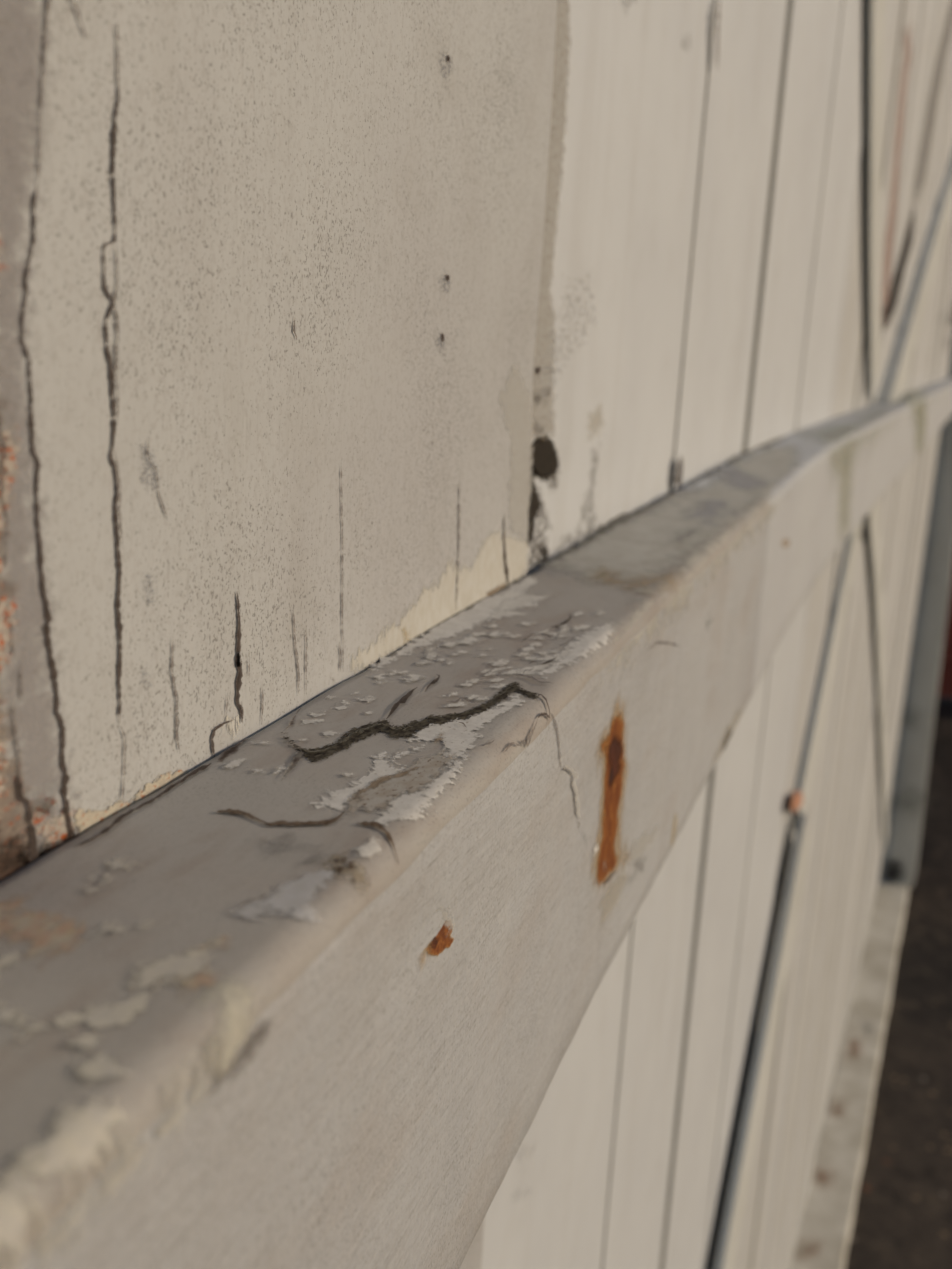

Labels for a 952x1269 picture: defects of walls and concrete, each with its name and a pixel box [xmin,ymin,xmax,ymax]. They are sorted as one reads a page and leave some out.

peeling [0,416,21,672]
crack [0,0,85,863]
crack [103,25,127,802]
crack [502,517,510,585]
peeling [223,0,803,921]
peeling [0,697,188,882]
peeling [0,949,212,1082]
crack [217,808,399,864]
crack [171,592,580,828]
rust [425,907,453,956]
rust [592,715,625,884]
peeling [0,1065,210,1269]